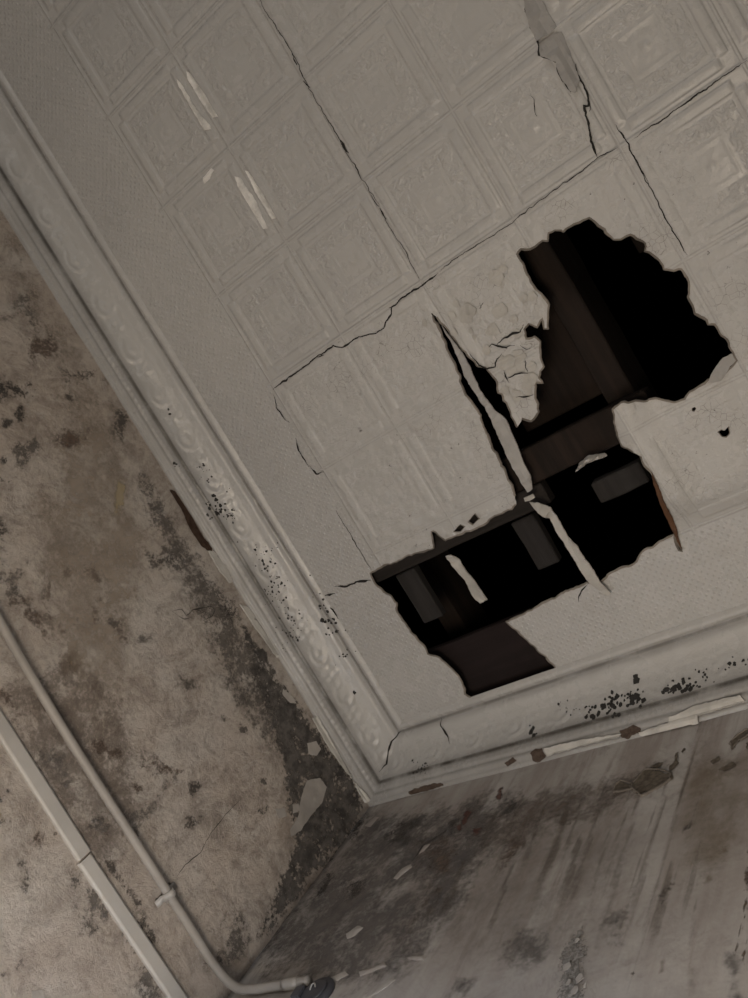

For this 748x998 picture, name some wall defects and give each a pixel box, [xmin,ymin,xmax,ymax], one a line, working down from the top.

crack [260,0,747,418]
damp [14,292,68,362]
peeling [448,299,539,402]
peeling [708,353,736,383]
damp [0,379,32,428]
crack [431,313,535,502]
peeling [575,453,607,472]
damp [0,394,646,980]
peeling [544,734,621,757]
peeling [638,695,746,736]
spalling [728,728,748,749]
damp [139,967,160,998]